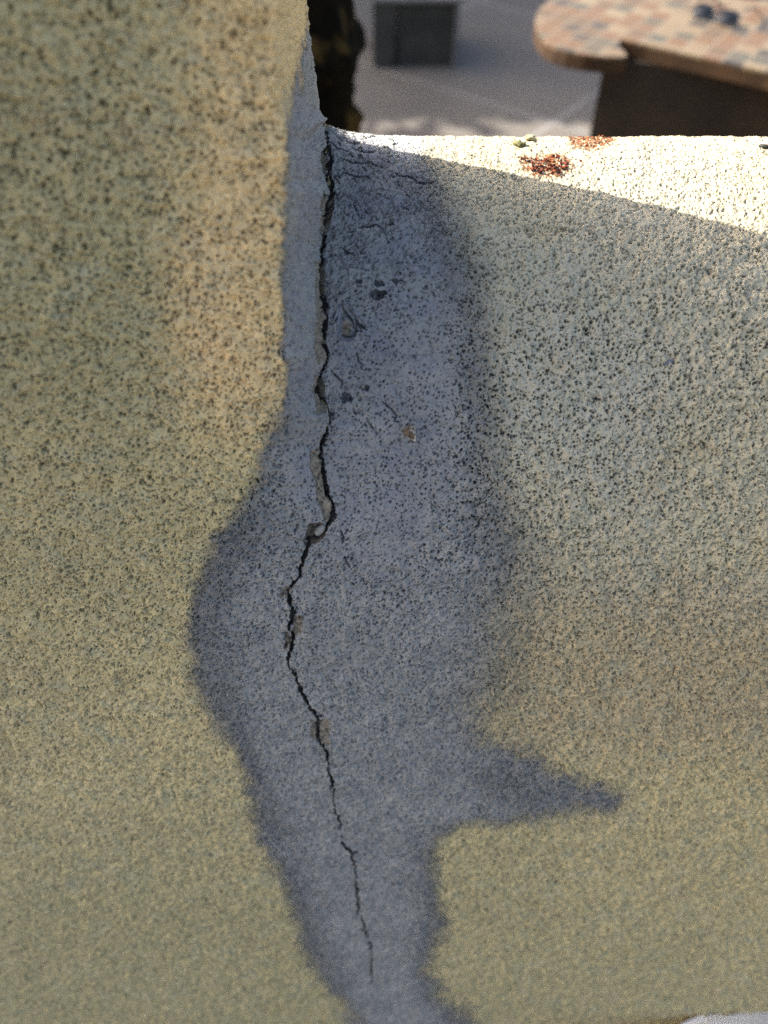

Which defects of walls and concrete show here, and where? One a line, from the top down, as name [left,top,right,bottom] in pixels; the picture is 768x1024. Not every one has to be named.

crack [279,123,437,983]